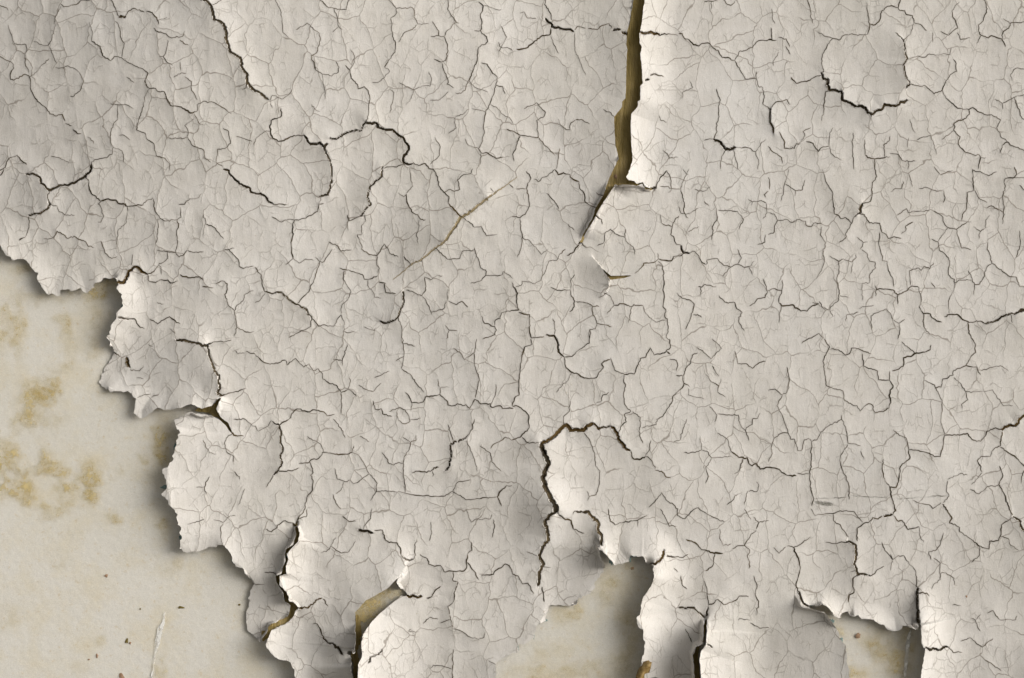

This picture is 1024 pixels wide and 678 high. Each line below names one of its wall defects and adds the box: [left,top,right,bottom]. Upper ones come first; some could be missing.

crack [314,614,382,678]
crack [0,0,839,641]
peeling [0,206,963,678]
crack [649,484,768,678]
crack [674,0,1024,623]
crack [925,604,1017,670]